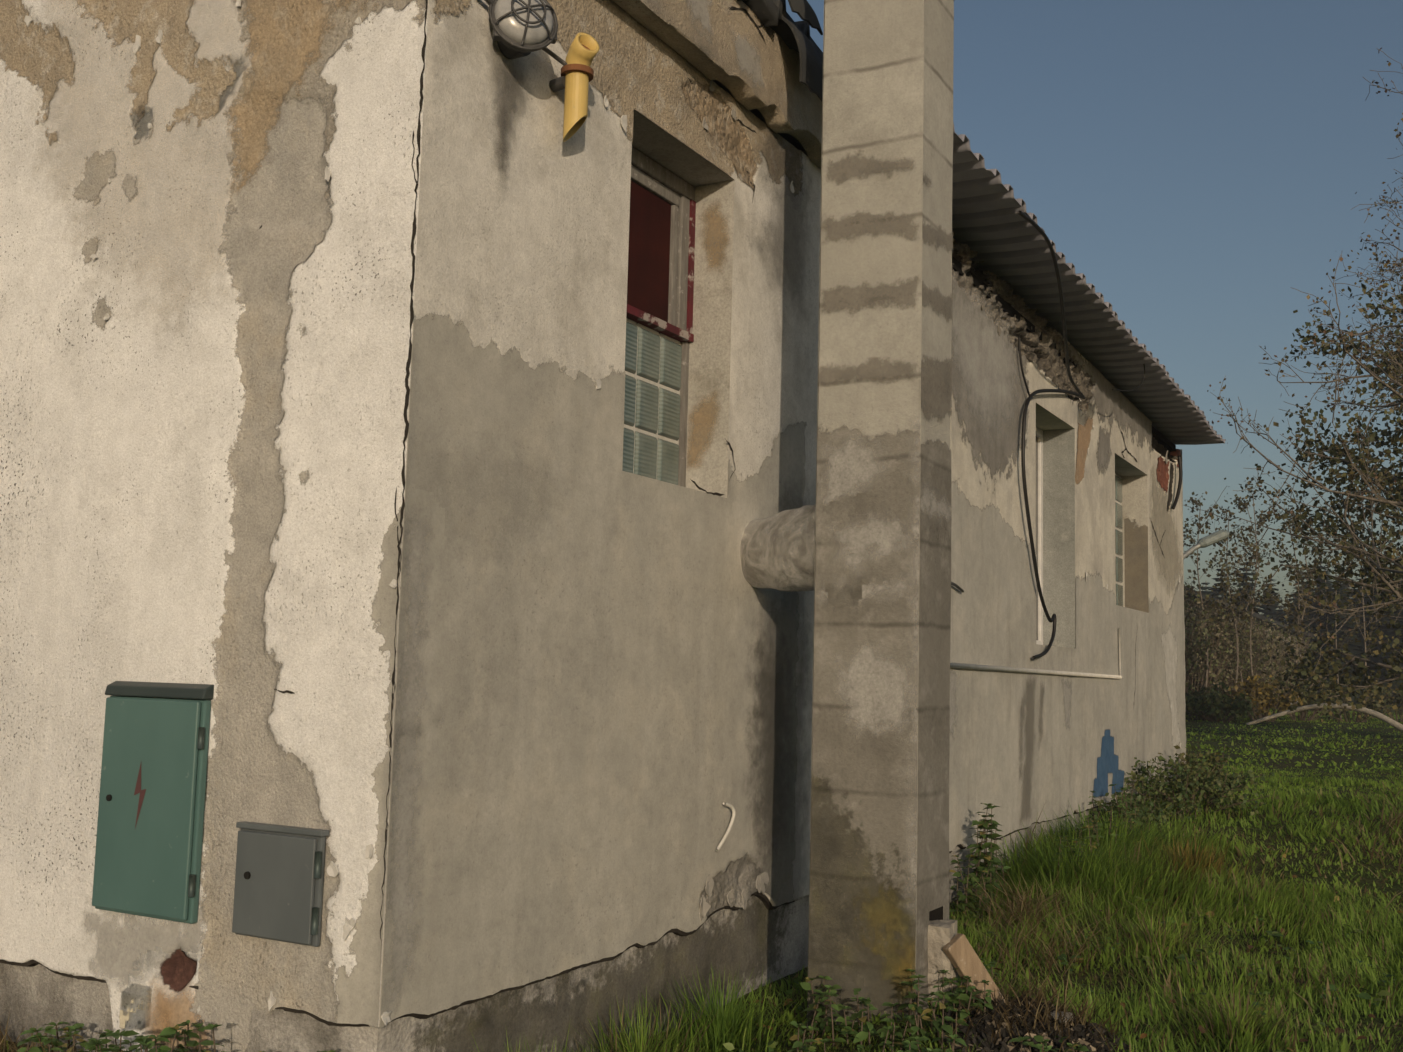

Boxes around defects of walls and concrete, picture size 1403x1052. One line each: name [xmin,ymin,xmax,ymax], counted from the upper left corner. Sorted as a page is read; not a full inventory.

peeling [0,0,75,145]
damp [704,208,727,266]
damp [827,154,931,184]
damp [822,212,953,251]
flaking render [952,230,1095,484]
peeling [73,0,806,1052]
damp [688,397,717,465]
spalling [1151,437,1181,511]
damp [807,273,1029,1028]
crack [0,959,107,983]
crack [275,891,795,1027]
damp [414,895,788,1052]